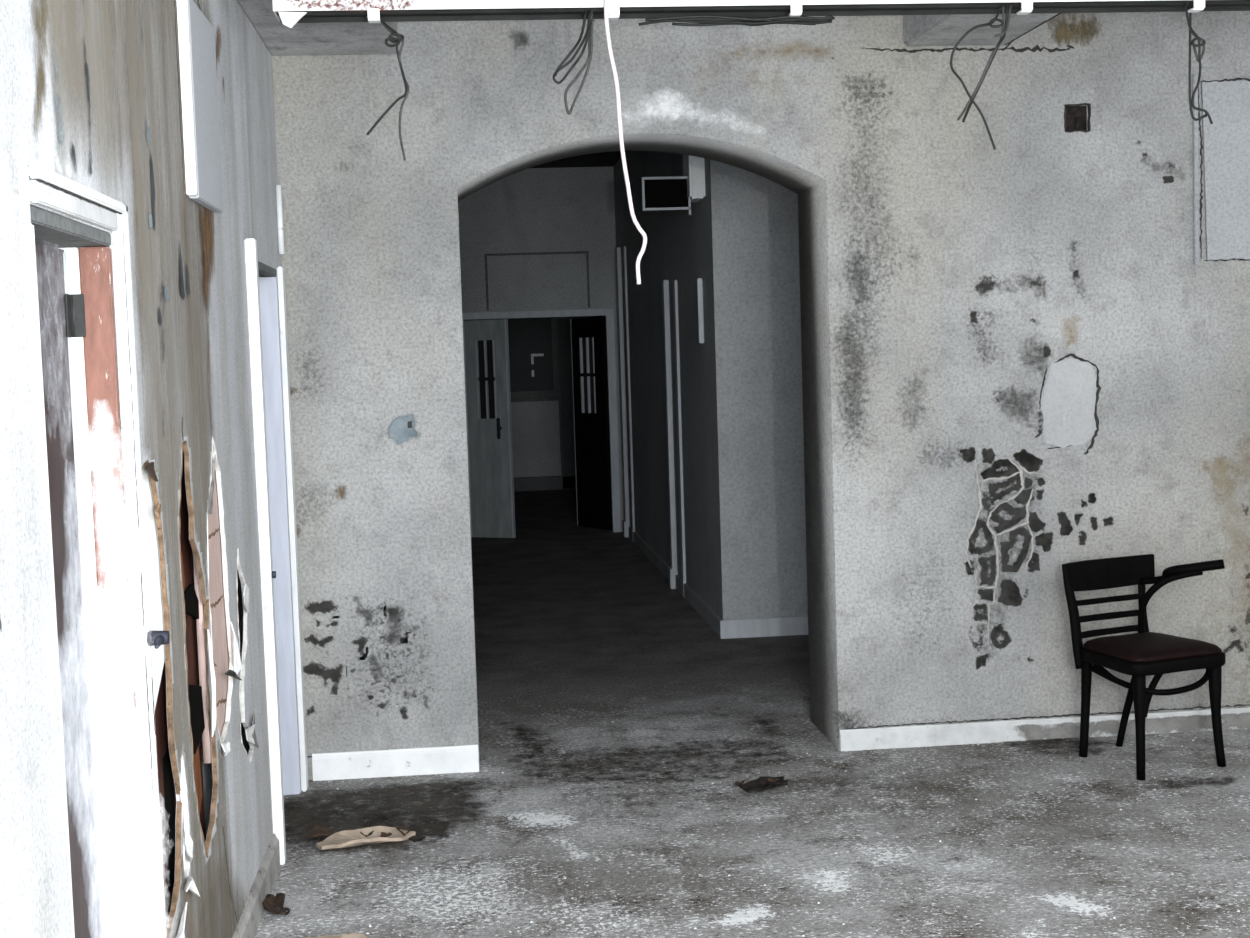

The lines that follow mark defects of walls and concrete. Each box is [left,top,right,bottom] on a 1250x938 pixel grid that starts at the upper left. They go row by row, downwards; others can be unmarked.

rust [288,0,411,12]
leakage [1050,16,1097,44]
leakage [842,151,888,422]
peeling [960,353,1113,669]
leakage [304,601,338,647]
leakage [1223,611,1250,653]
spalling [142,417,259,938]
leakage [303,663,355,695]
leakage [353,607,428,719]